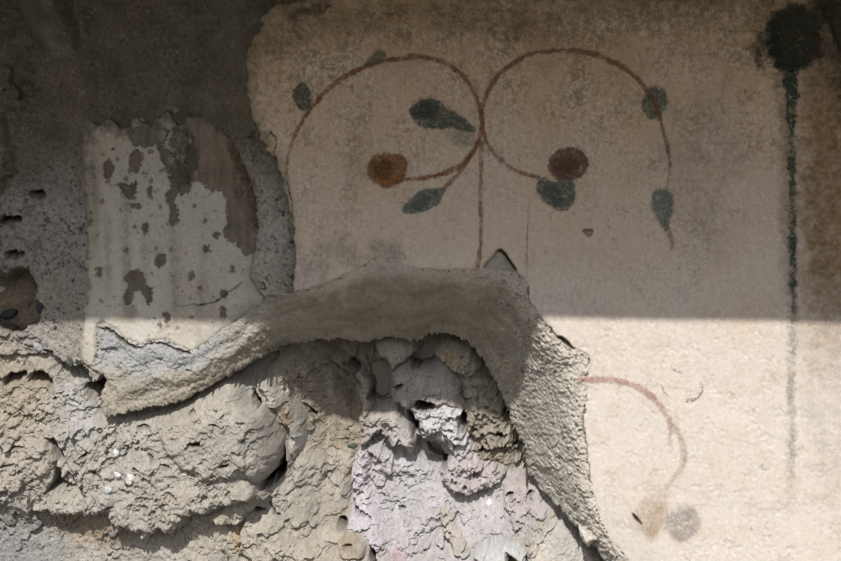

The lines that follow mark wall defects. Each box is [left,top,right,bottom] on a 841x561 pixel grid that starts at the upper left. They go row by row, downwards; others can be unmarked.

flaking render [92,117,260,256]
flaking render [123,247,173,306]
flaking render [219,290,237,320]
spalling [1,370,54,391]
spalling [82,377,107,402]
spalling [0,411,93,517]
spalling [217,333,604,561]